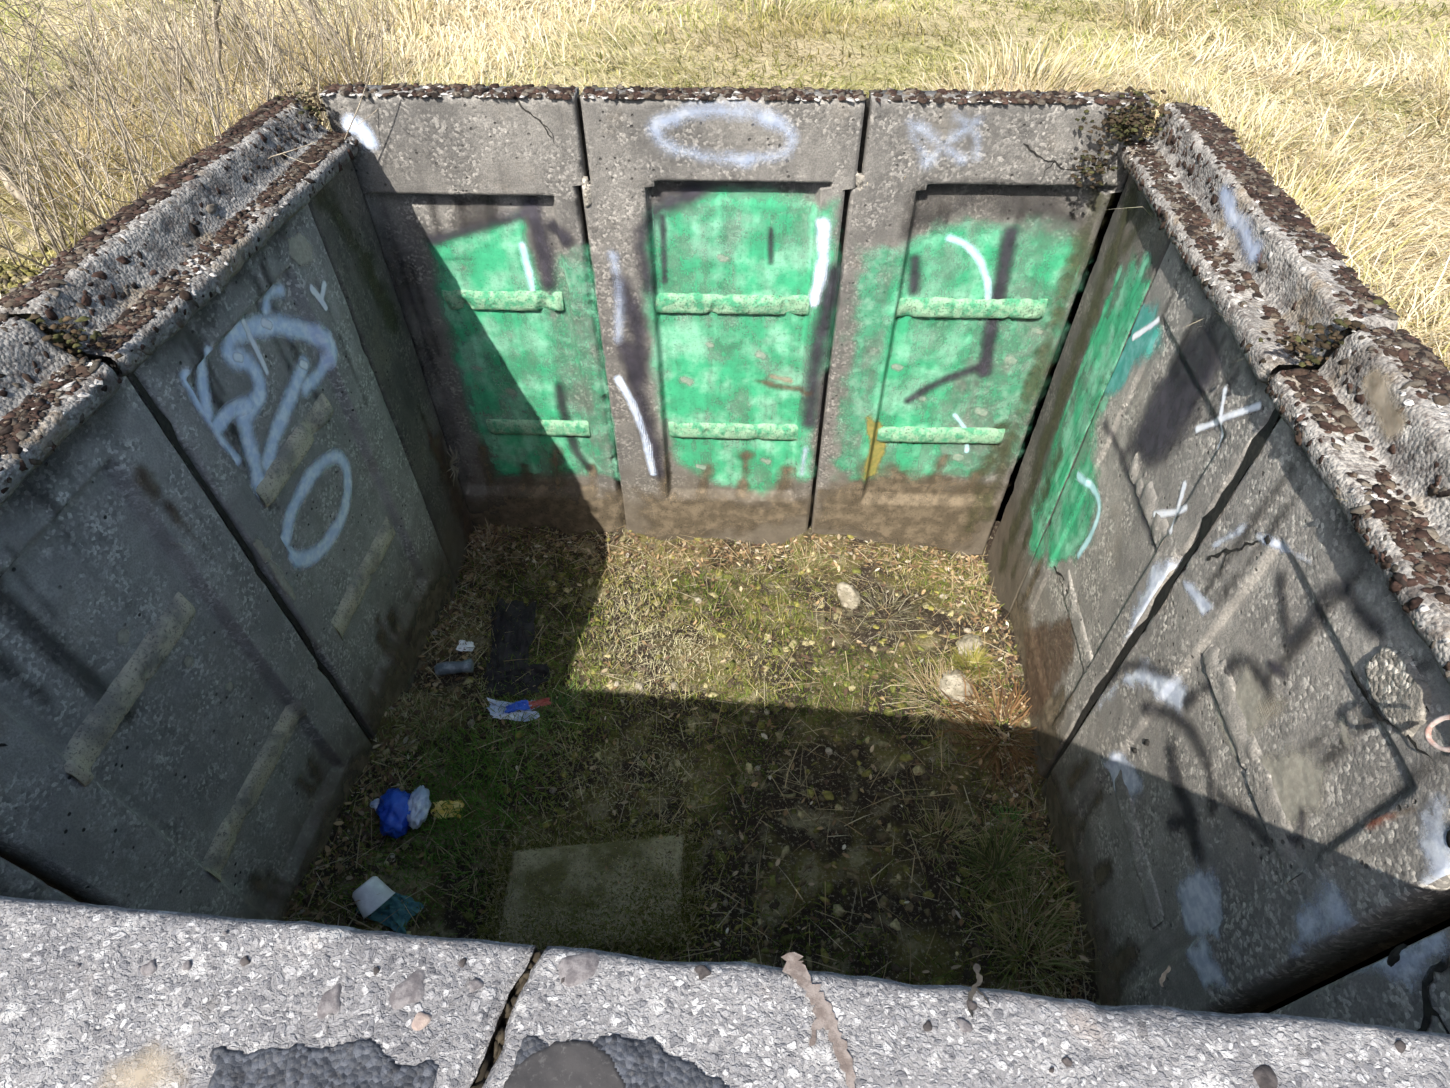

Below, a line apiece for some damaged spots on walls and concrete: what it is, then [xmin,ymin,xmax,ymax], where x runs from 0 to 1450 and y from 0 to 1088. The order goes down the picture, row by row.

crack [1207,539,1262,573]
spalling [411,1012,432,1031]